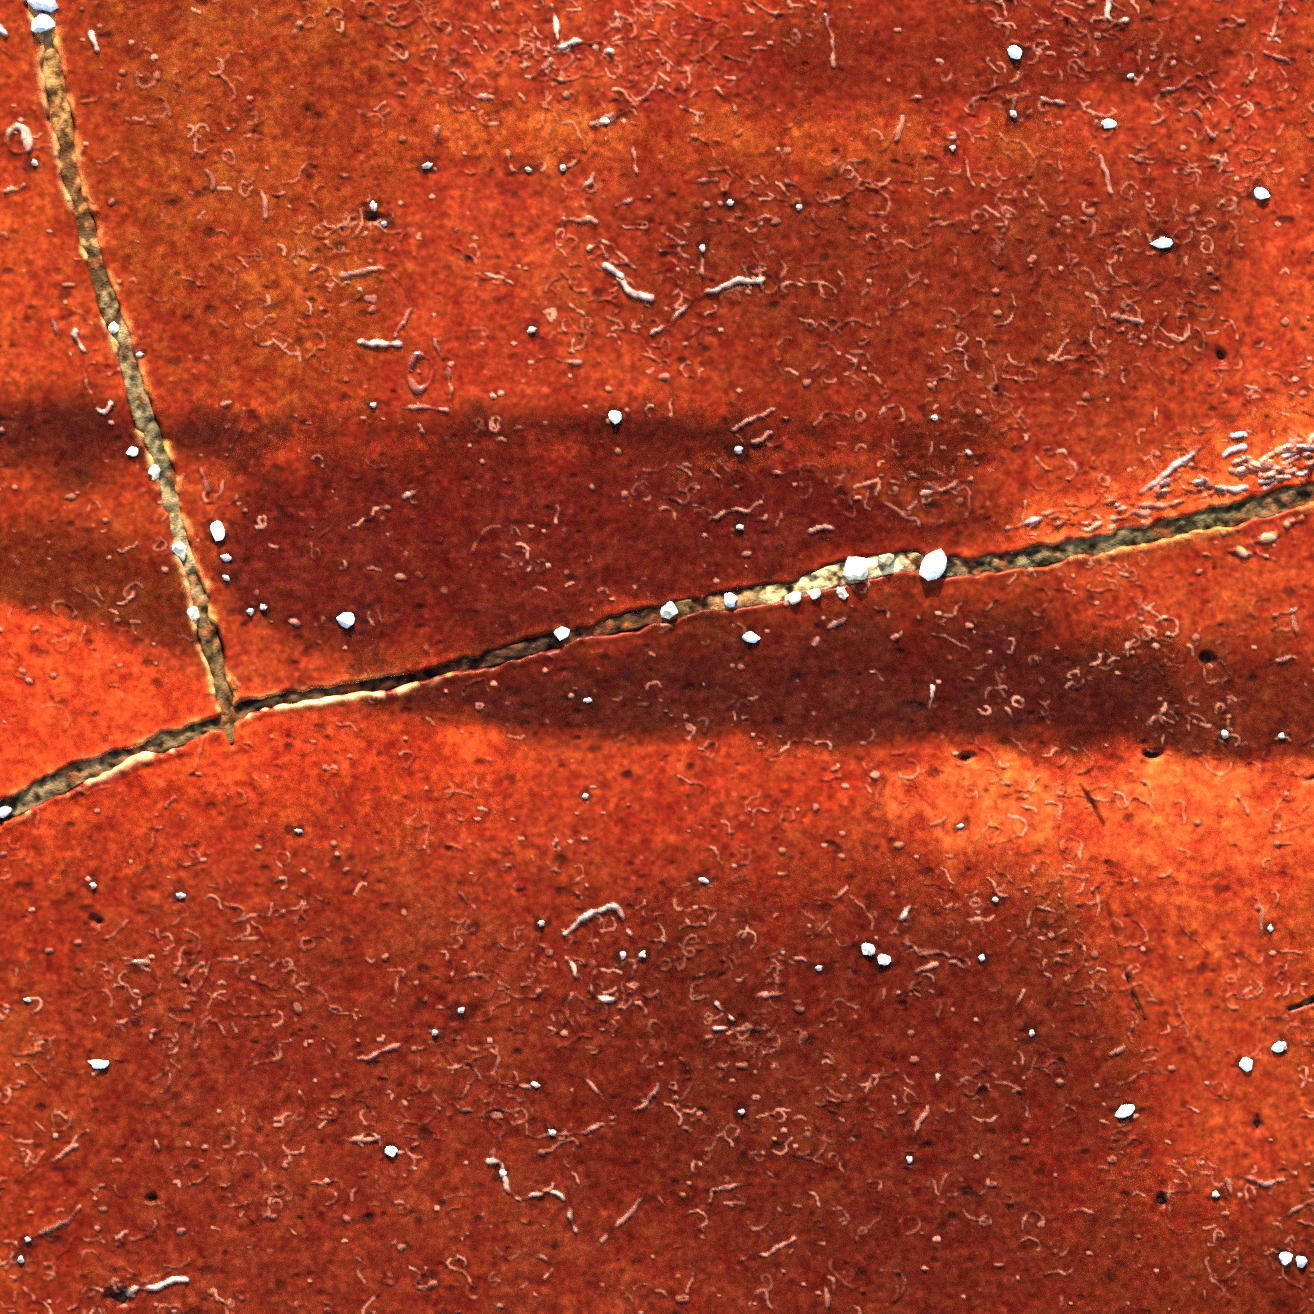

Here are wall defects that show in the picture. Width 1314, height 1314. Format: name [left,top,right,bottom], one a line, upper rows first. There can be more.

corrosion [103,0,381,403]
corrosion [379,106,950,174]
corrosion [983,131,1044,165]
crack [0,0,1314,825]
corrosion [1003,415,1314,546]
corrosion [0,601,513,836]
corrosion [881,750,1314,895]